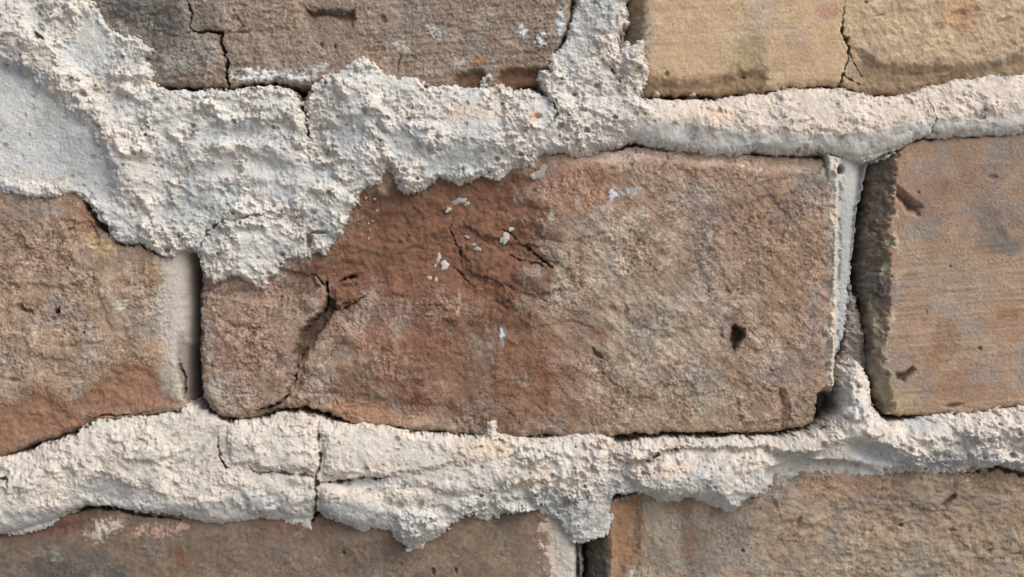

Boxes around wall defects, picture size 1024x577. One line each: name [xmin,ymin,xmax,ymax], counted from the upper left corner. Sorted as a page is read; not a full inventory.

crack [189,5,231,85]
crack [505,231,552,267]
crack [313,275,358,312]